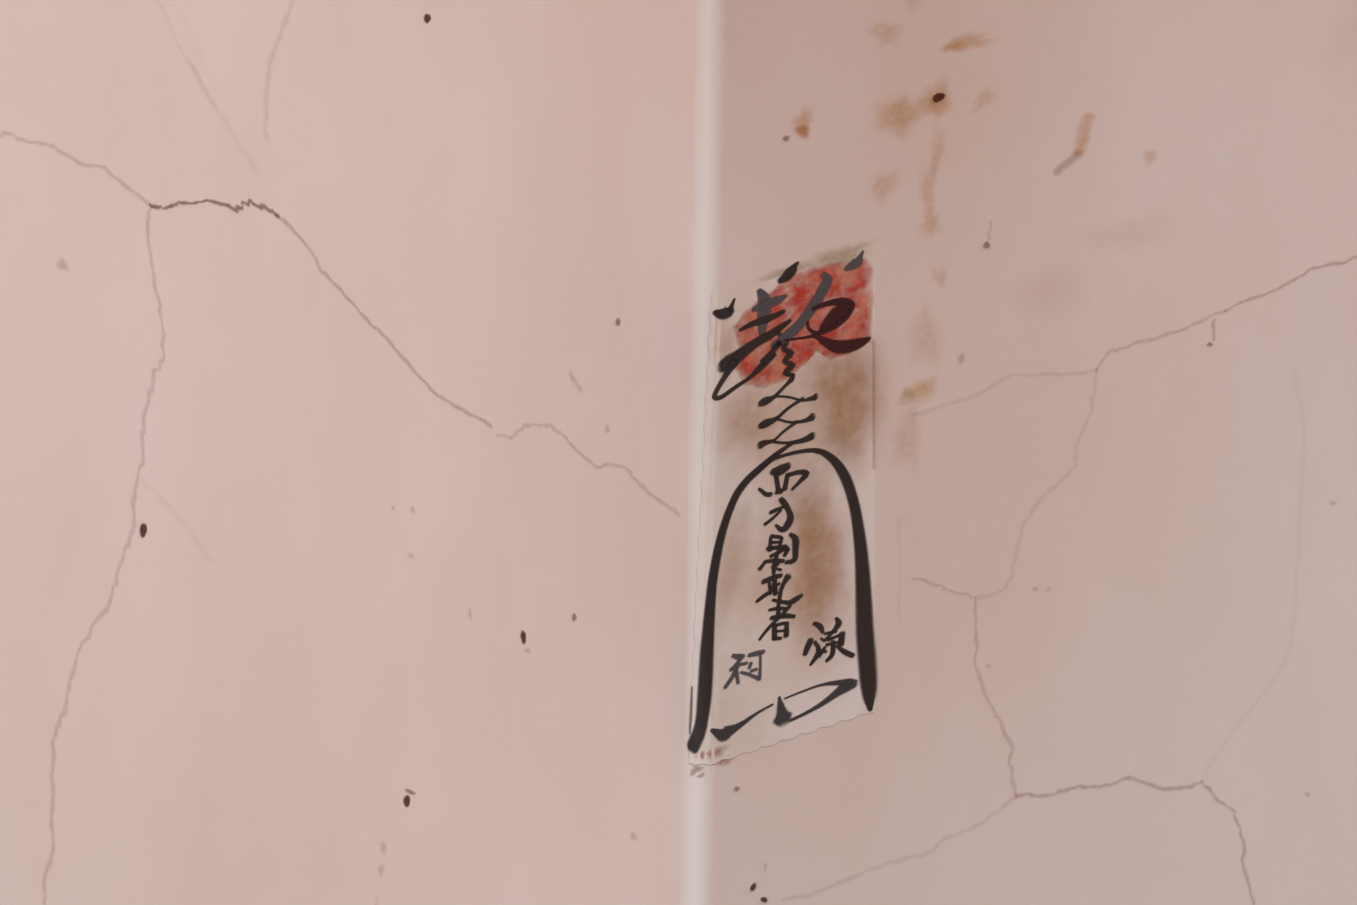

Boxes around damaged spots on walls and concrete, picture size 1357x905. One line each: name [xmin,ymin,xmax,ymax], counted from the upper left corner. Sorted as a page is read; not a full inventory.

crack [149,200,279,217]